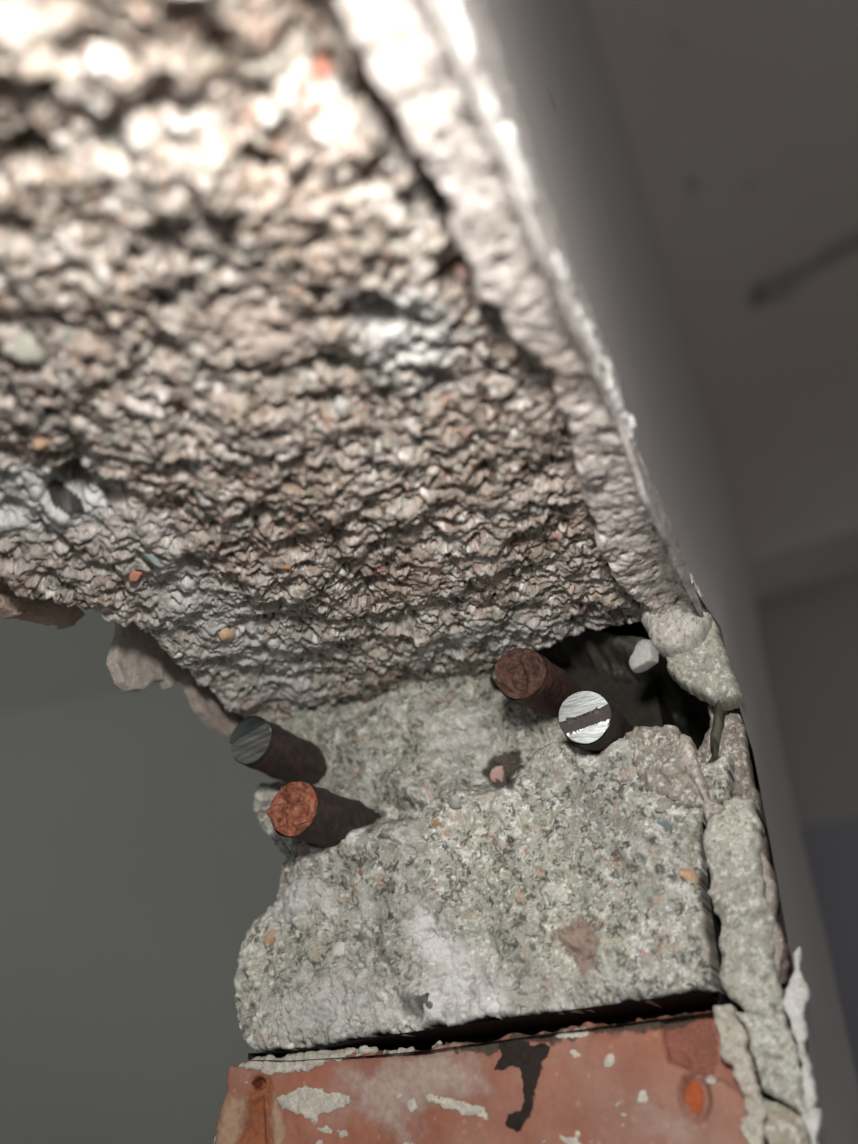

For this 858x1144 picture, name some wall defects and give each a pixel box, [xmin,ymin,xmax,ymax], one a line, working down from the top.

peeling [106,621,242,738]
spalling [534,628,726,763]
spalling [483,751,524,789]
crack [248,867,745,1061]
spalling [662,1017,718,1075]
corrosion [216,1076,286,1144]
crack [762,1091,792,1108]